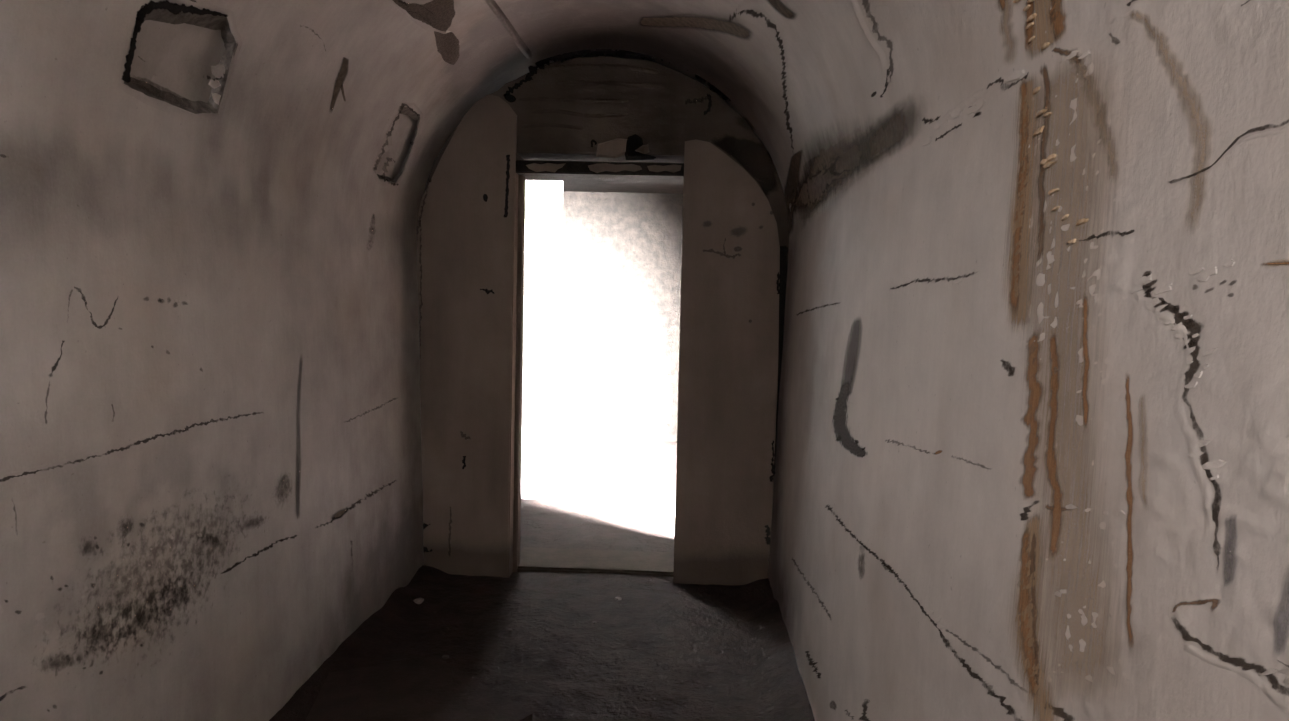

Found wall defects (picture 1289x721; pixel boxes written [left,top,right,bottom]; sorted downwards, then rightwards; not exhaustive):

peeling [208,64,225,105]
crack [730,1,801,148]
water stain [784,107,915,233]
rust [1000,0,1065,53]
crack [1066,230,1134,245]
crack [1169,120,1289,183]
crack [0,404,260,511]
crack [222,360,396,573]
water stain [832,320,867,457]
rust [1009,58,1114,721]
rust [1125,378,1145,645]
crack [1130,260,1289,715]